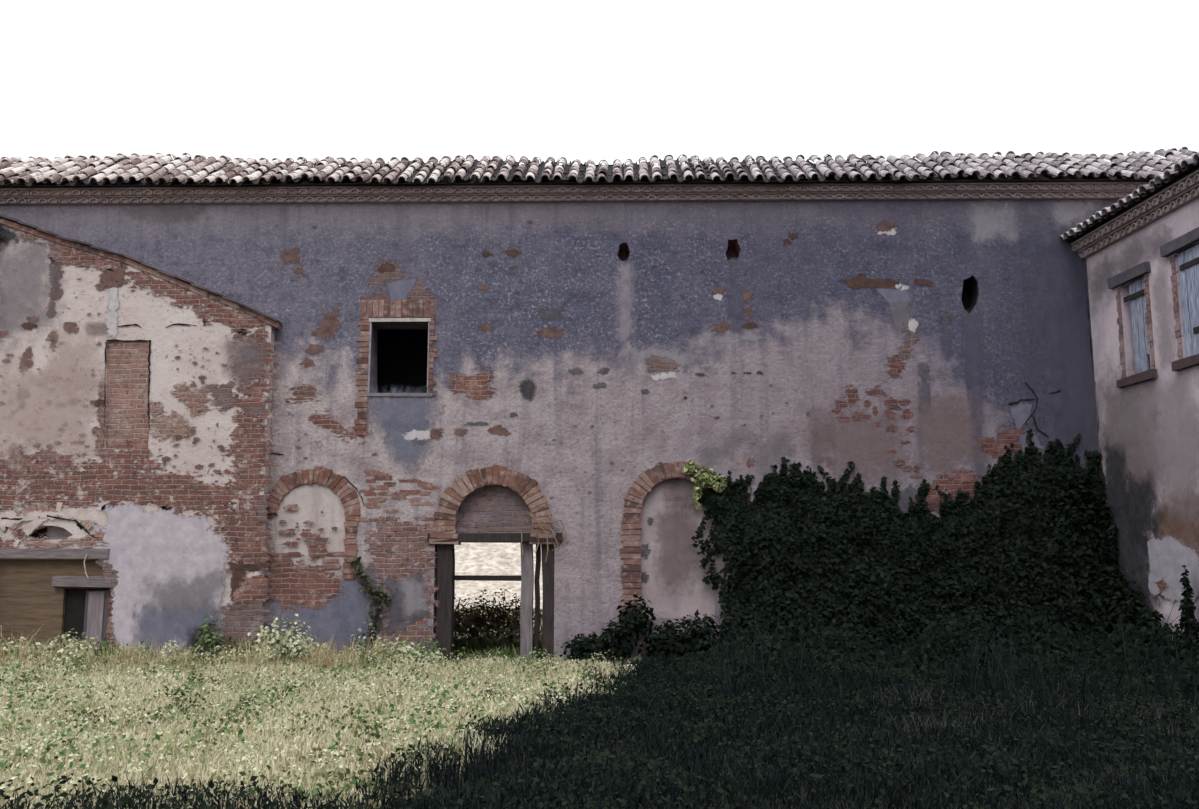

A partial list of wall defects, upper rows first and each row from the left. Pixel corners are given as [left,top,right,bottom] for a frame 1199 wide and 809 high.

water stain [971,201,1016,241]
water stain [1055,199,1094,223]
water stain [618,265,631,340]
flaking render [0,226,441,661]
water stain [370,390,433,466]
water stain [520,379,535,401]
flaking render [832,273,933,511]
flaking render [976,403,1045,458]
crack [1008,382,1061,438]
crack [1086,284,1103,485]
water stain [1028,238,1199,619]